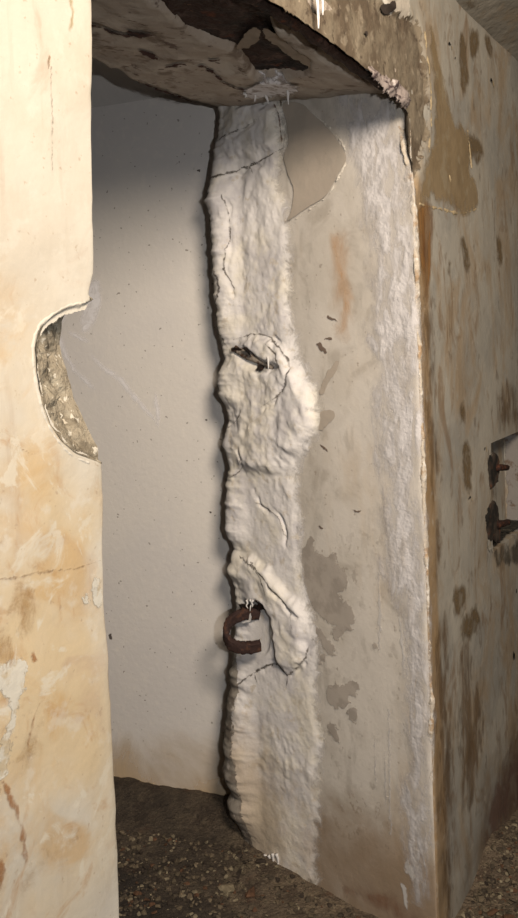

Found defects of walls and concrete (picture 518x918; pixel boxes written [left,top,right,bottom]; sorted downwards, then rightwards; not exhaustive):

corrosion [91,24,153,39]
corrosion [198,60,246,92]
peeling [236,27,311,68]
corrosion [244,0,397,99]
water stain [460,31,492,91]
spalling [269,0,478,222]
spalling [31,297,102,464]
crack [247,333,289,399]
crack [240,557,291,613]
water stain [453,587,480,637]
crack [238,649,308,685]
water stain [0,657,28,780]